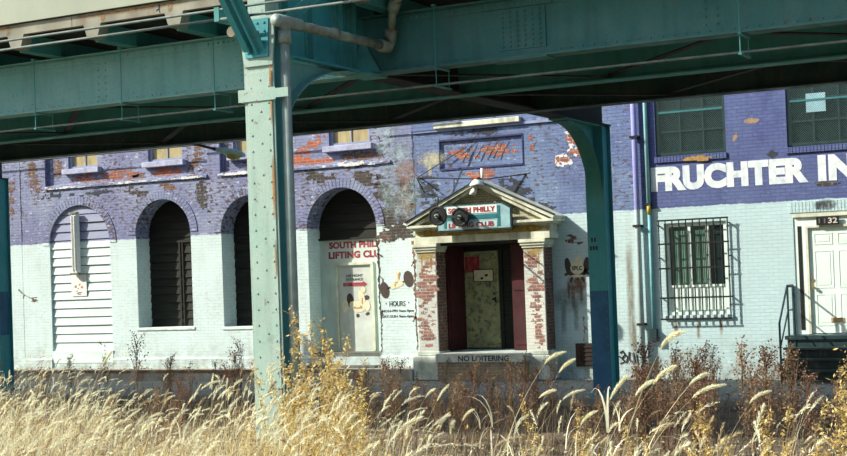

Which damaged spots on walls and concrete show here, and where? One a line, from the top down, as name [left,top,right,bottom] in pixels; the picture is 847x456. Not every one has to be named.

rust [90,2,175,21]
peeling [27,146,213,223]
spalling [293,134,447,243]
spalling [554,131,581,167]
peeling [415,256,439,348]
peeling [524,251,545,350]
rust [568,278,585,300]